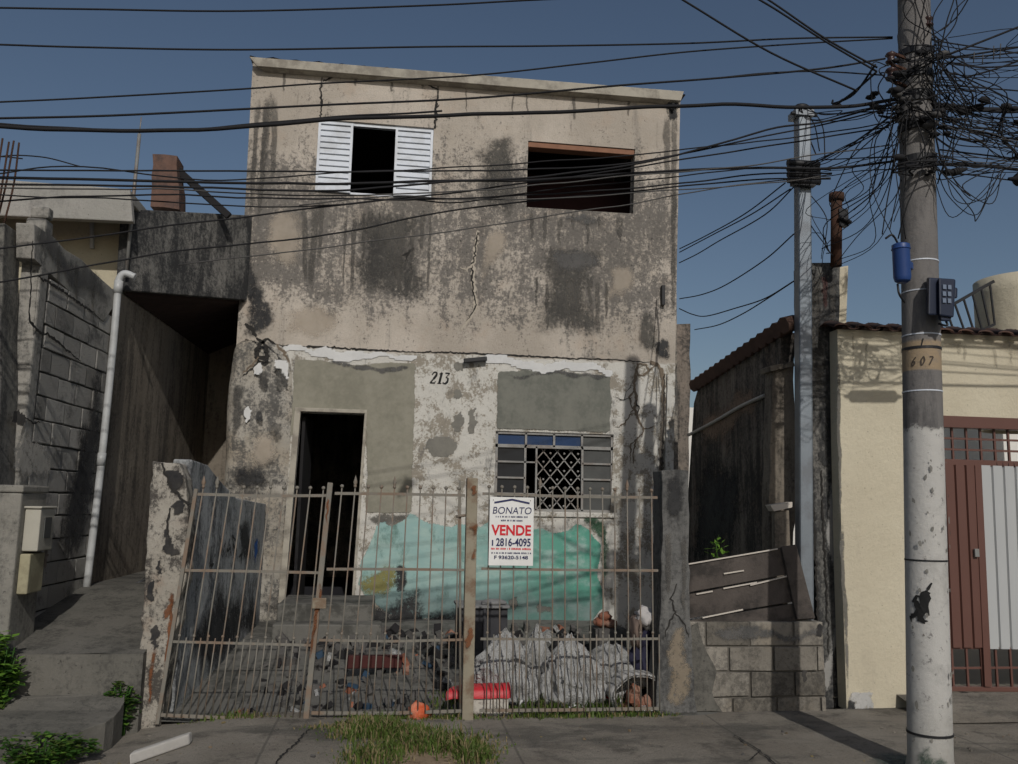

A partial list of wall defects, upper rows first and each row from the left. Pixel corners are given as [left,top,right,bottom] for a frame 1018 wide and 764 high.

water stain [245,263,272,335]
water stain [303,208,324,281]
water stain [343,213,431,298]
water stain [530,213,608,333]
crack [243,230,658,464]
water stain [58,373,101,556]
spalling [165,470,185,515]
spalling [426,408,477,457]
spalling [146,529,179,601]
spalling [150,599,173,650]
crack [663,584,689,638]